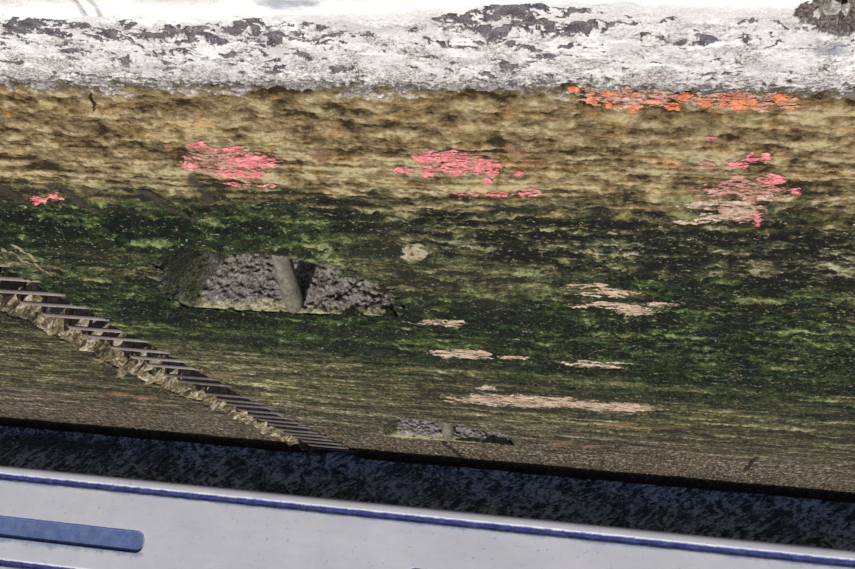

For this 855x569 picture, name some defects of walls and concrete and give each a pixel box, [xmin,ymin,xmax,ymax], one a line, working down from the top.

spalling [407,3,807,113]
spalling [737,0,855,49]
leakage [1,245,52,276]
spalling [0,282,329,458]